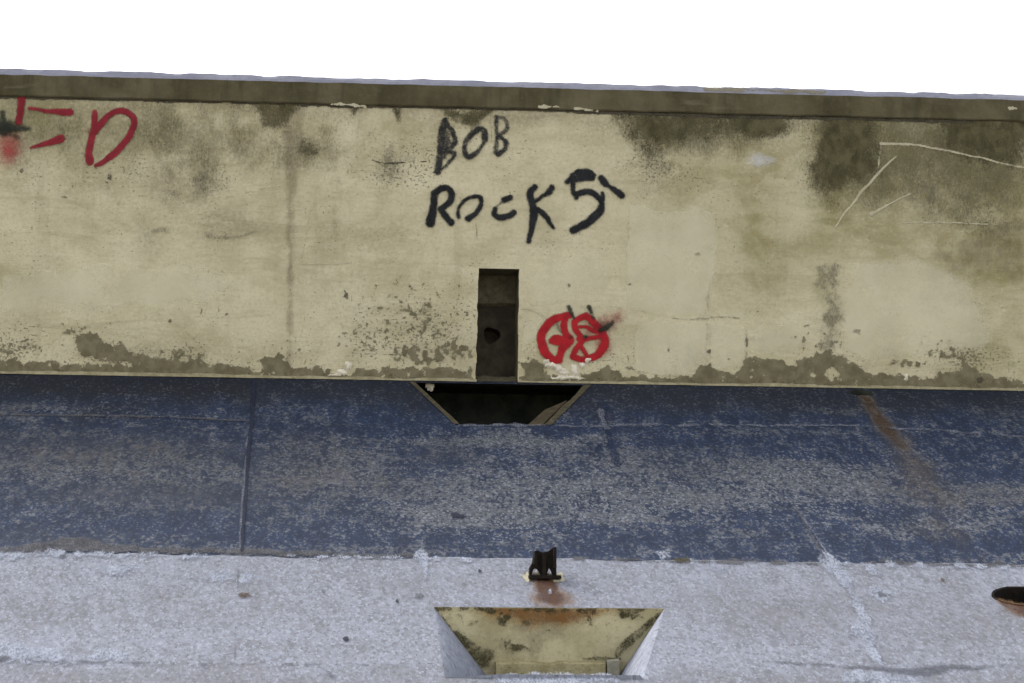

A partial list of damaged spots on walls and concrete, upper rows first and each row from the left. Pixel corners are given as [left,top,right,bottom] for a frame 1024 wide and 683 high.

leakage [807,117,1024,218]
corrosion [482,573,608,629]